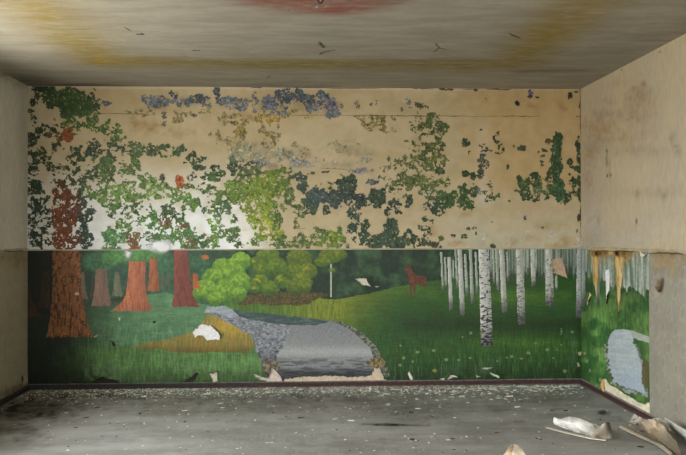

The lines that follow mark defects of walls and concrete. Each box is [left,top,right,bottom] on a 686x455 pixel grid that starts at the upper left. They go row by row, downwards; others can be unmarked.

peeling [28,86,526,257]
peeling [514,131,581,234]
flaking render [193,324,220,340]
flaking render [253,368,384,381]